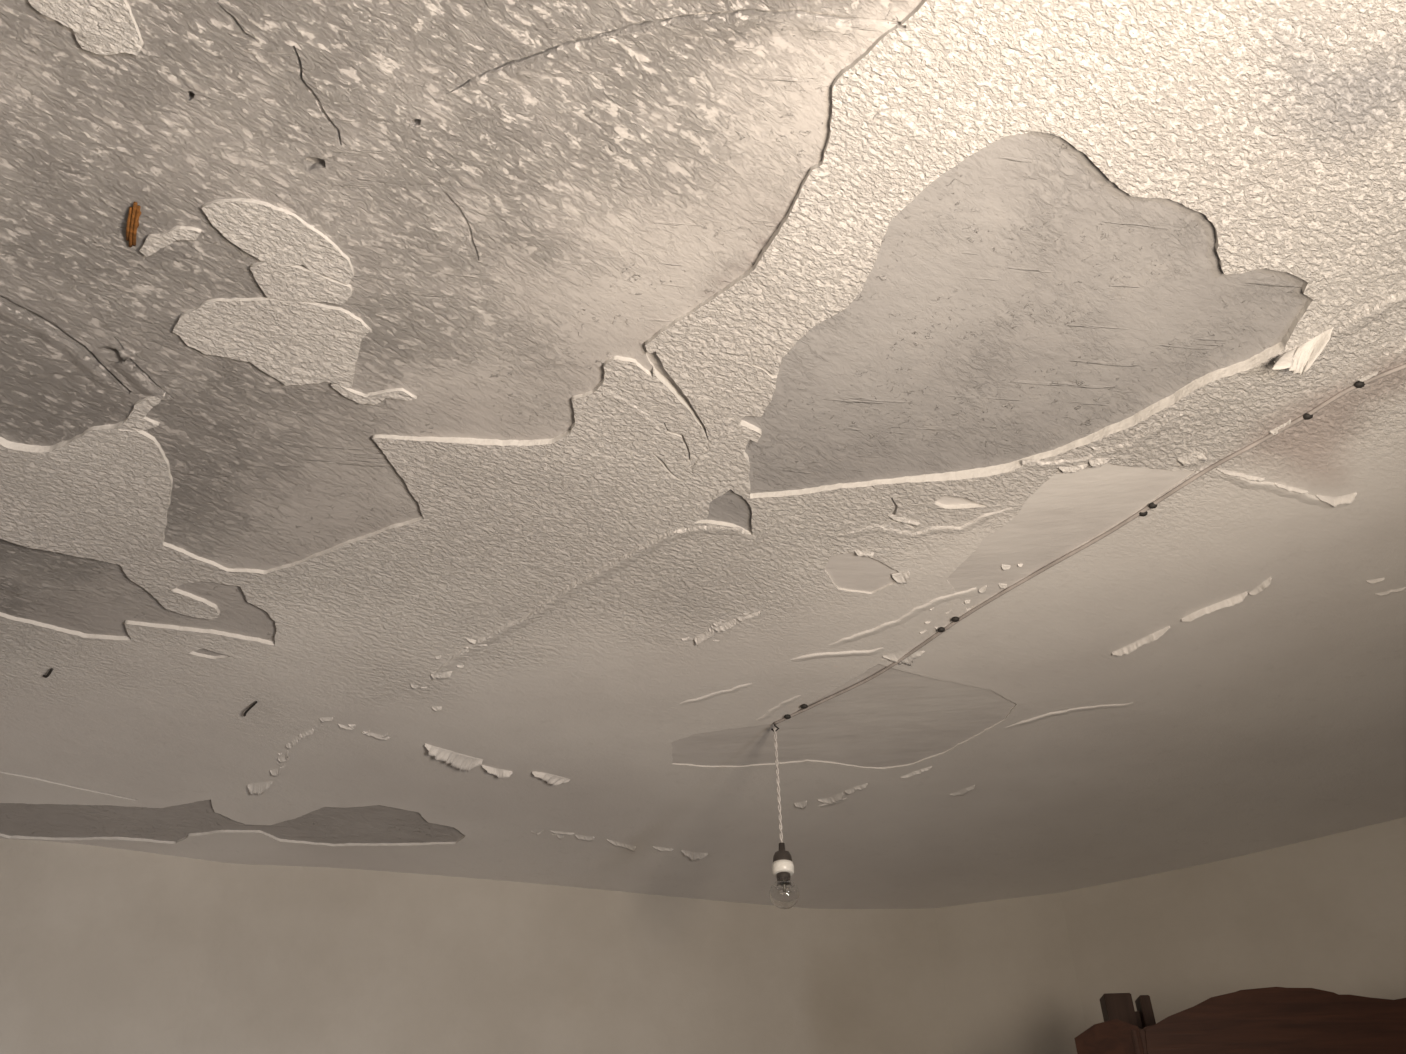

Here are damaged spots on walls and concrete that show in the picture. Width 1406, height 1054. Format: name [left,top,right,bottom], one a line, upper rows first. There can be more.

crack [217,2,255,40]
crack [292,46,342,146]
rust [126,202,141,248]
crack [445,193,480,262]
peeling [0,0,926,659]
peeling [671,131,1357,810]
peeling [424,743,513,779]
peeling [532,771,571,786]
peeling [0,799,465,846]